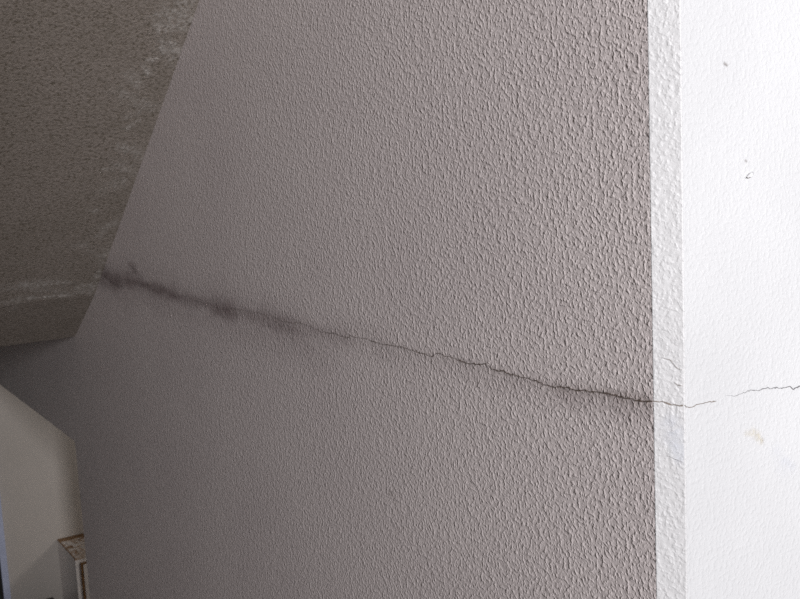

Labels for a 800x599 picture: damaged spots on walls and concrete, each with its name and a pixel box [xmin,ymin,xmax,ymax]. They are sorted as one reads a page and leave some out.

crack [343,336,800,408]